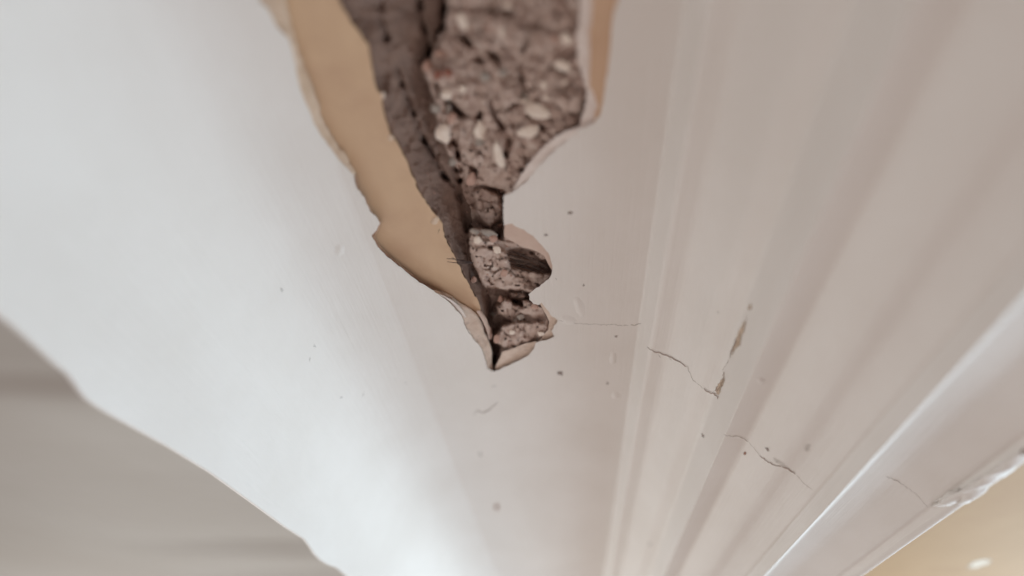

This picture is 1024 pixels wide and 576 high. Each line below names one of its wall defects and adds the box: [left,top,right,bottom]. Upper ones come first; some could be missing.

spalling [260,0,618,371]
crack [732,436,808,487]